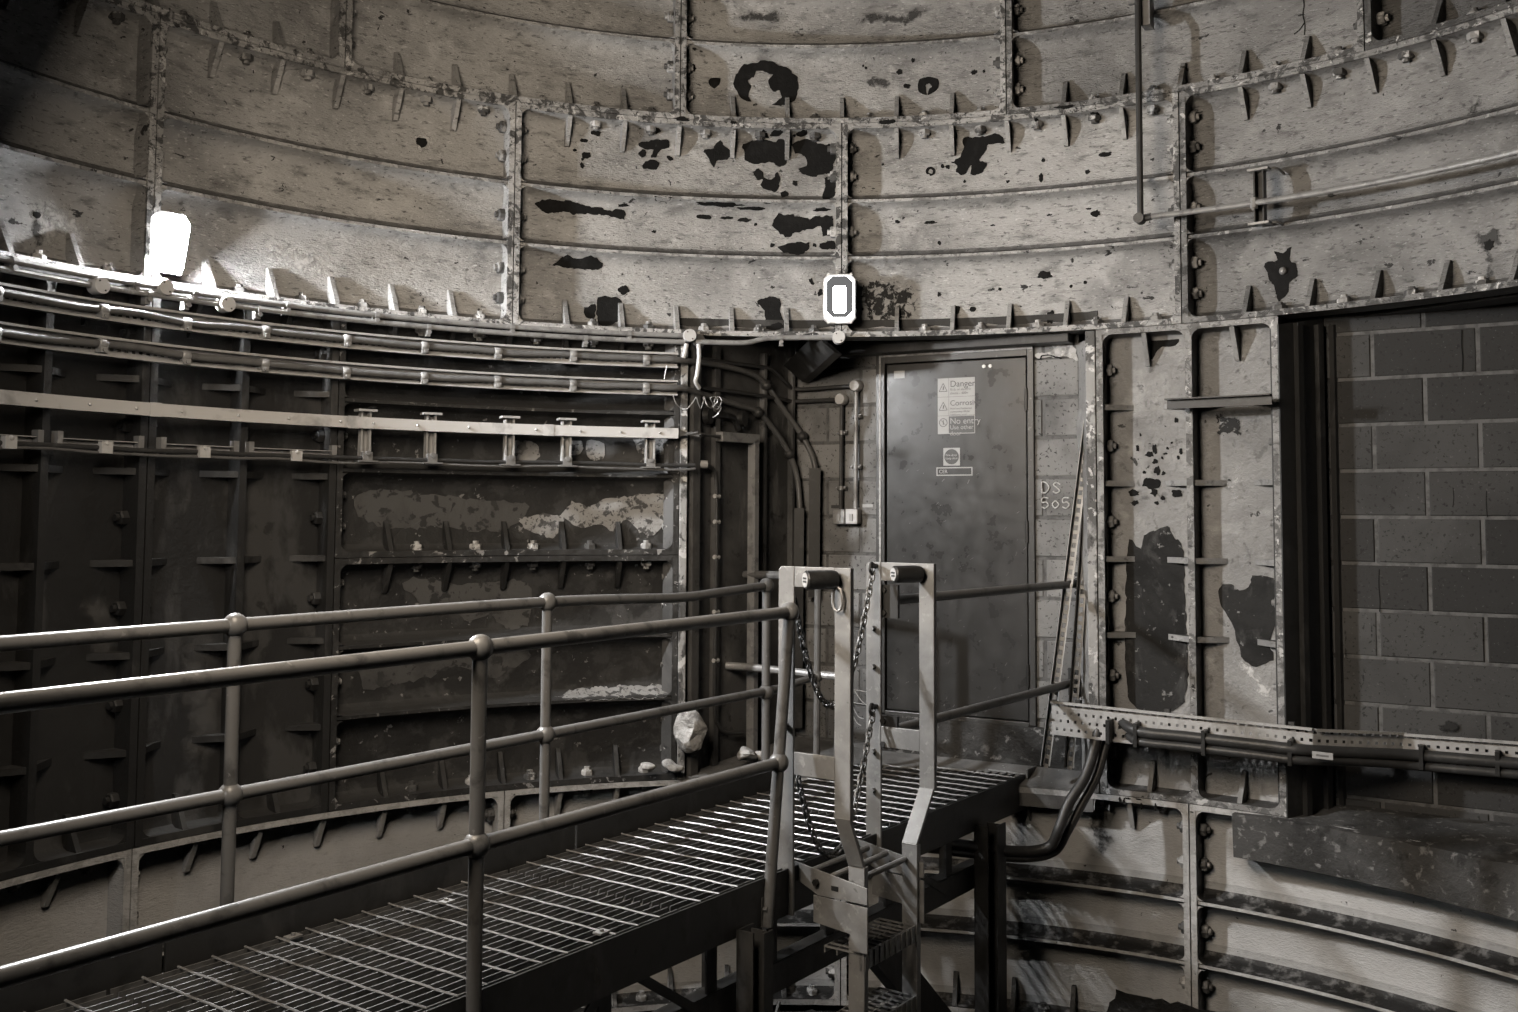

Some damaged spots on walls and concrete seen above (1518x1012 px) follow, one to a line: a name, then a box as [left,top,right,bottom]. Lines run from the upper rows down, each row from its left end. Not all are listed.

peeling [693,60,799,106]
peeling [573,131,601,169]
peeling [638,116,690,170]
peeling [696,127,836,255]
peeling [926,130,1005,183]
peeling [1128,417,1183,506]
peeling [1124,526,1189,712]
peeling [1218,575,1275,667]